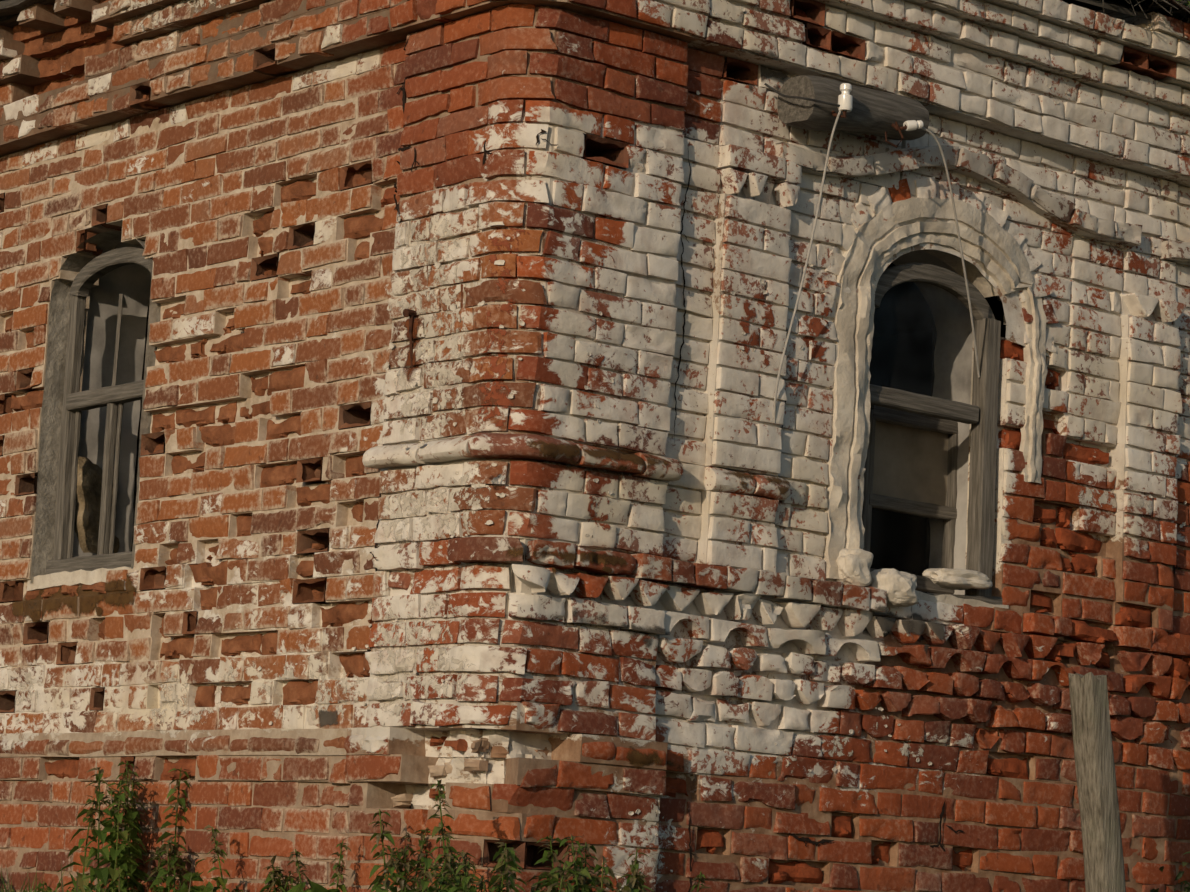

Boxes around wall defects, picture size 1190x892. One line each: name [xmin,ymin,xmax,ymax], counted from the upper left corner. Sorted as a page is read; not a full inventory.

spalling [769,0,866,60]
spalling [721,57,758,85]
spalling [1109,46,1176,81]
spalling [581,133,630,168]
spalling [339,160,373,190]
peeling [384,211,530,449]
spalling [338,401,372,429]
spalling [1033,481,1165,576]
spalling [0,580,106,603]
spalling [23,622,78,664]
spalling [0,672,40,720]
spalling [89,688,105,710]